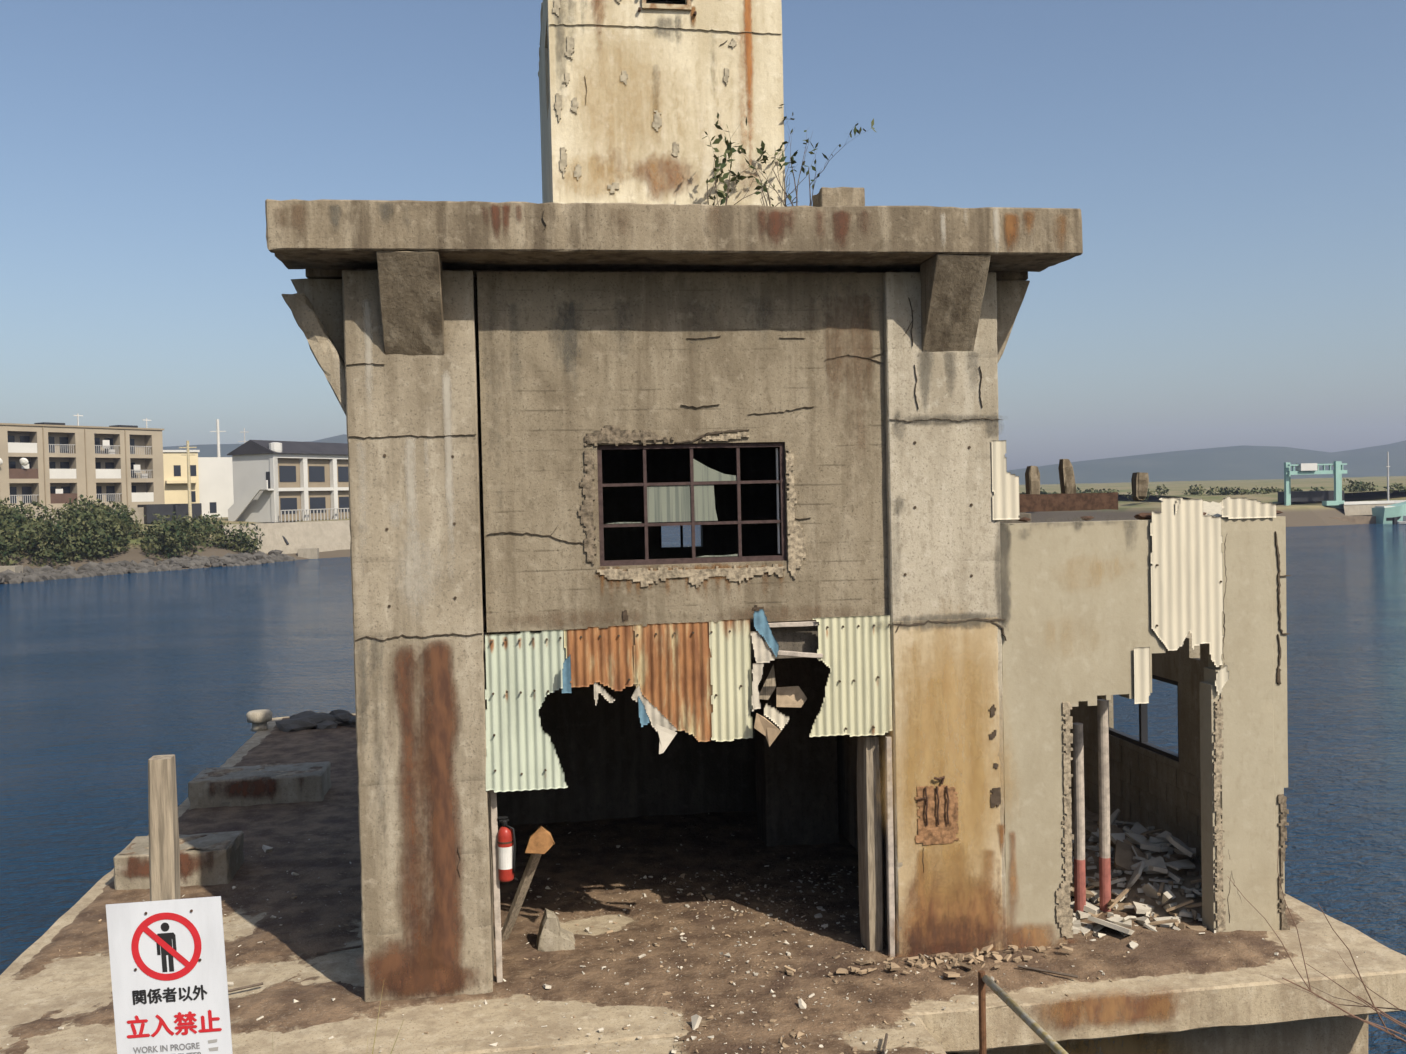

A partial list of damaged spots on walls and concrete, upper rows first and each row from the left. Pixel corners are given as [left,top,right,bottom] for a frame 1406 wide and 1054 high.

corrosion [744,0,753,109]
crack [827,297,1001,422]
spalling [702,432,749,441]
crack [490,526,584,544]
spalling [597,448,806,588]
corrosion [125,857,149,877]
corrosion [180,852,212,878]
corrosion [369,641,473,999]
spalling [489,702,1074,1054]
corrosion [897,657,1051,958]
spalling [1199,695,1230,956]
peeling [1086,925,1145,982]